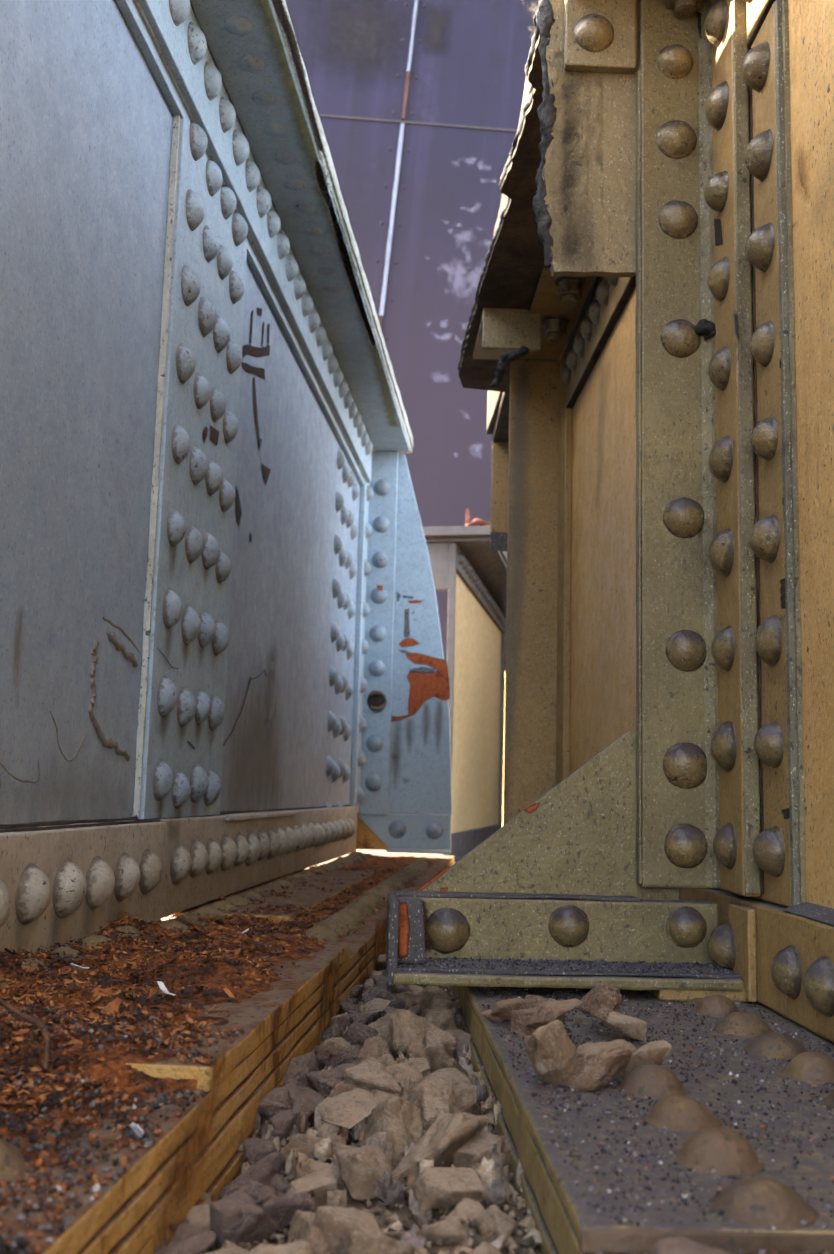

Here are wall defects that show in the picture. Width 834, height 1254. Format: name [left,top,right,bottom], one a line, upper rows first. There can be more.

corrosion [203,426,219,445]
corrosion [241,308,270,484]
peeling [391,592,450,722]